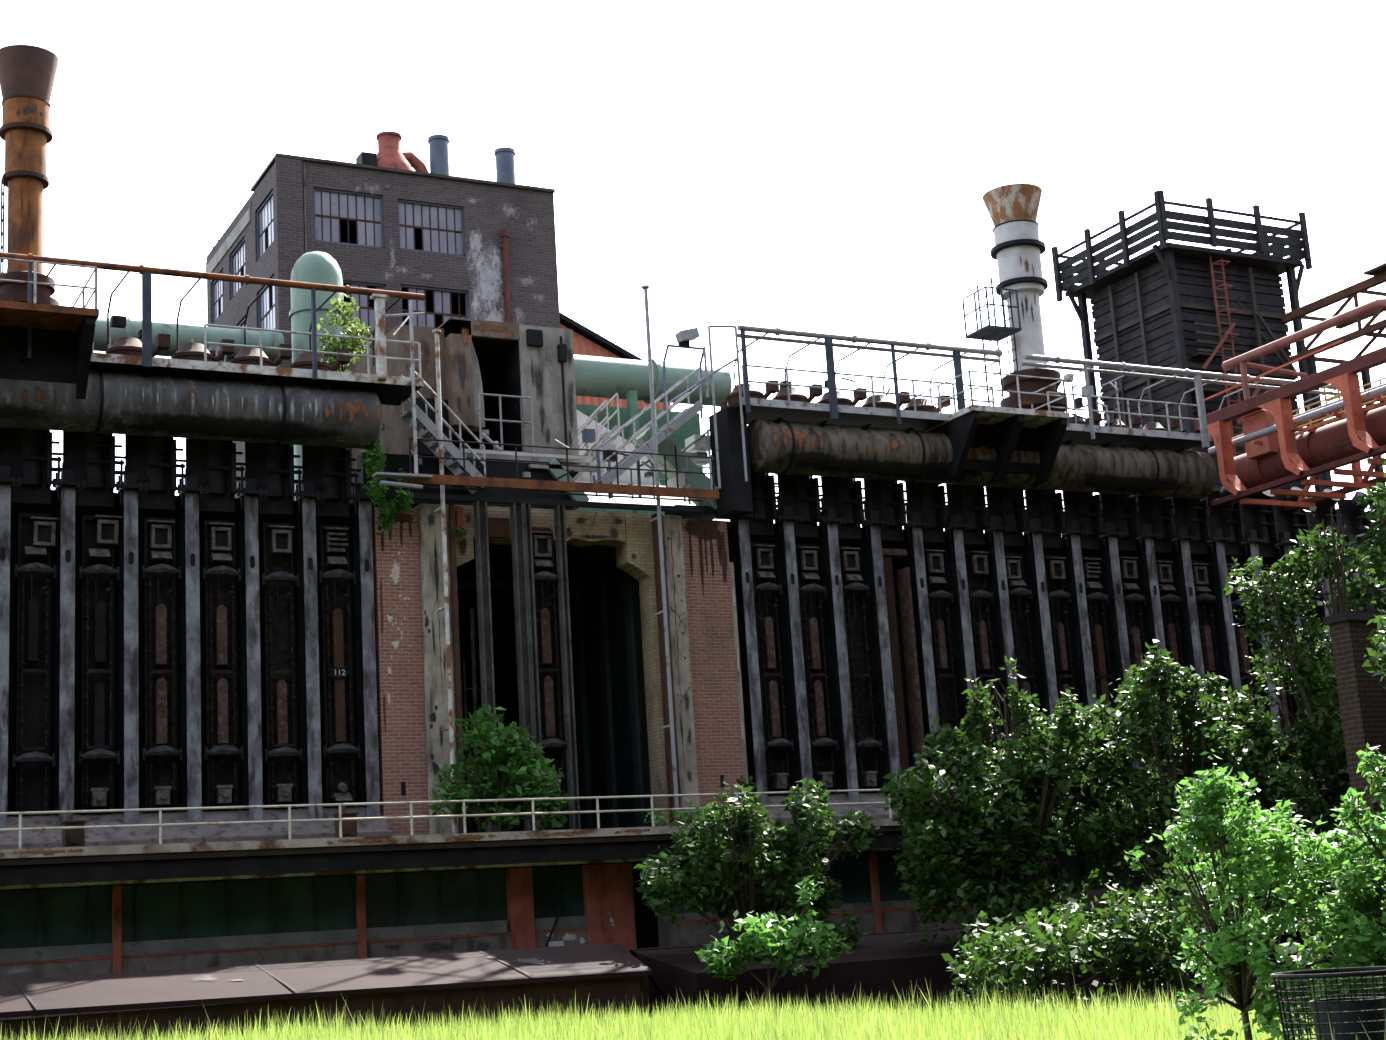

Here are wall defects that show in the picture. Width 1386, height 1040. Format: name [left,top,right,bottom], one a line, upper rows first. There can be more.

corrosion [325,401,381,429]
corrosion [773,427,824,452]
spalling [386,540,411,674]